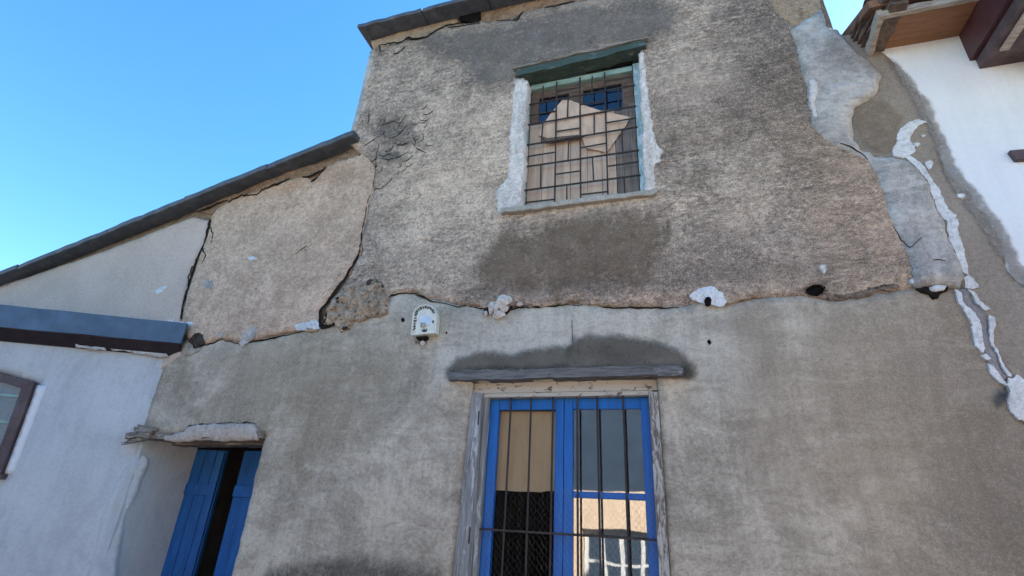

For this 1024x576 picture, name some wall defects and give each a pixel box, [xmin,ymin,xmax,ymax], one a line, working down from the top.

crack [180,219,214,319]
crack [204,104,433,346]
spalling [321,278,389,333]
crack [389,292,483,309]
water stain [480,210,669,293]
crack [511,303,679,311]
spalling [826,278,948,302]
peeling [905,134,1024,422]
flaking render [164,423,259,443]